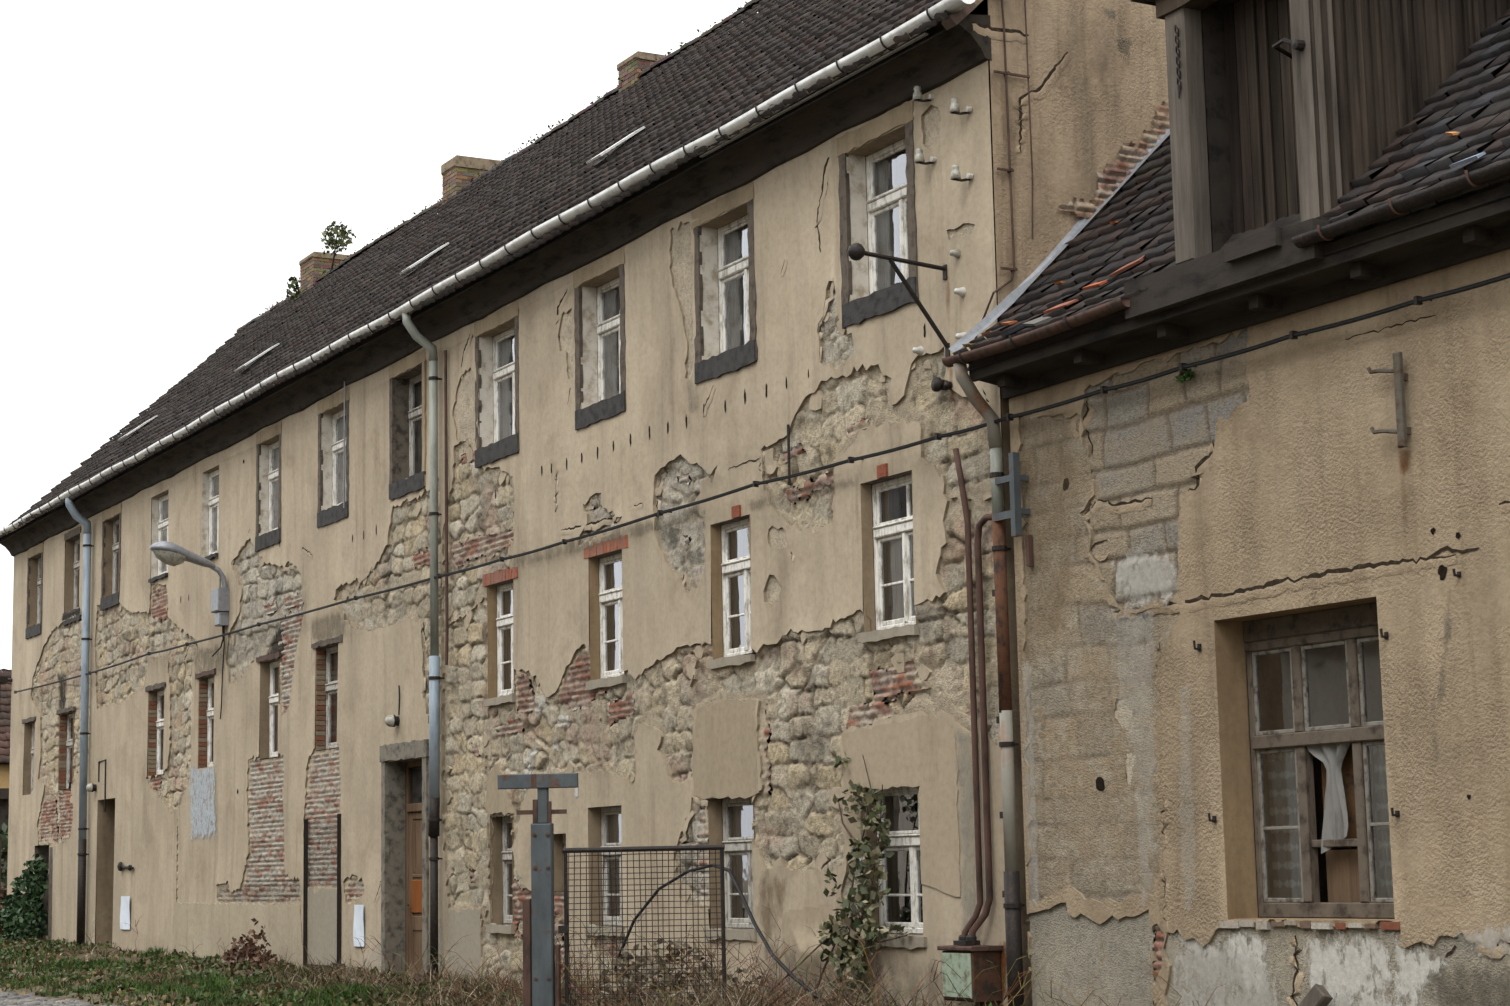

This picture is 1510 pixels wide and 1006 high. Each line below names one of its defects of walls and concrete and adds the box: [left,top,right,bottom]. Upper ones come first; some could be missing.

crack [972,21,1072,153]
crack [1499,500,1510,514]
spalling [31,583,198,845]
spalling [226,538,304,716]
spalling [334,281,1510,1006]
crack [1113,546,1479,688]
spalling [216,744,364,906]
crack [1157,799,1171,929]